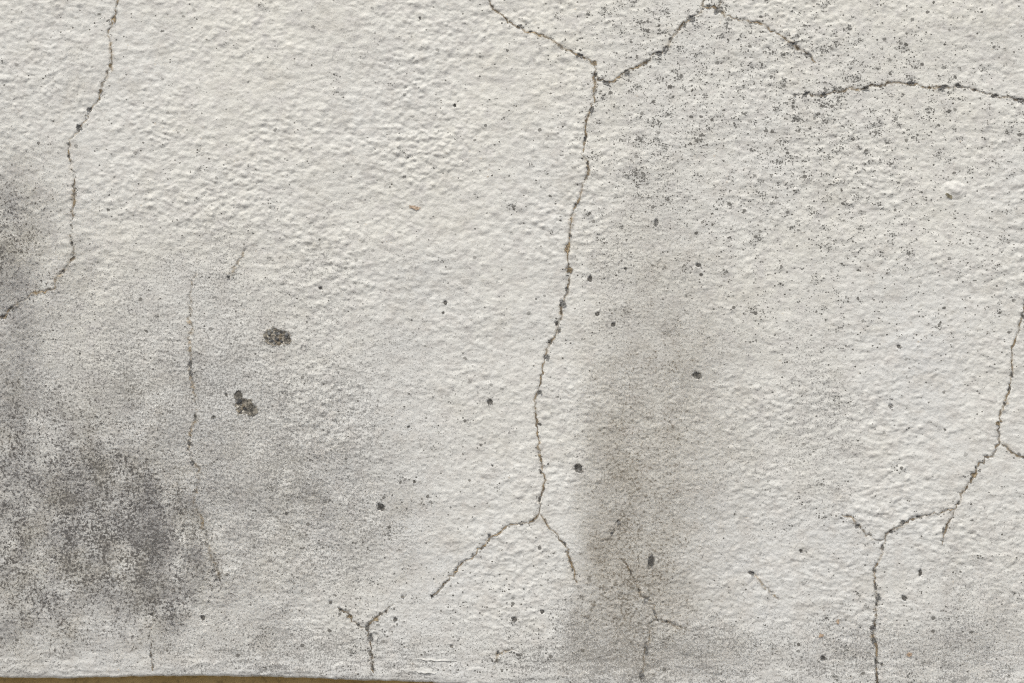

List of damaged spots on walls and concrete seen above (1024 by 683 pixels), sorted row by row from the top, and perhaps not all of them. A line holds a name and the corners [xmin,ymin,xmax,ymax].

crack [0,0,118,318]
water stain [0,173,248,668]
crack [329,596,404,673]
crack [431,0,816,598]
water stain [574,301,712,677]
crack [794,81,1024,103]
crack [842,306,1024,683]